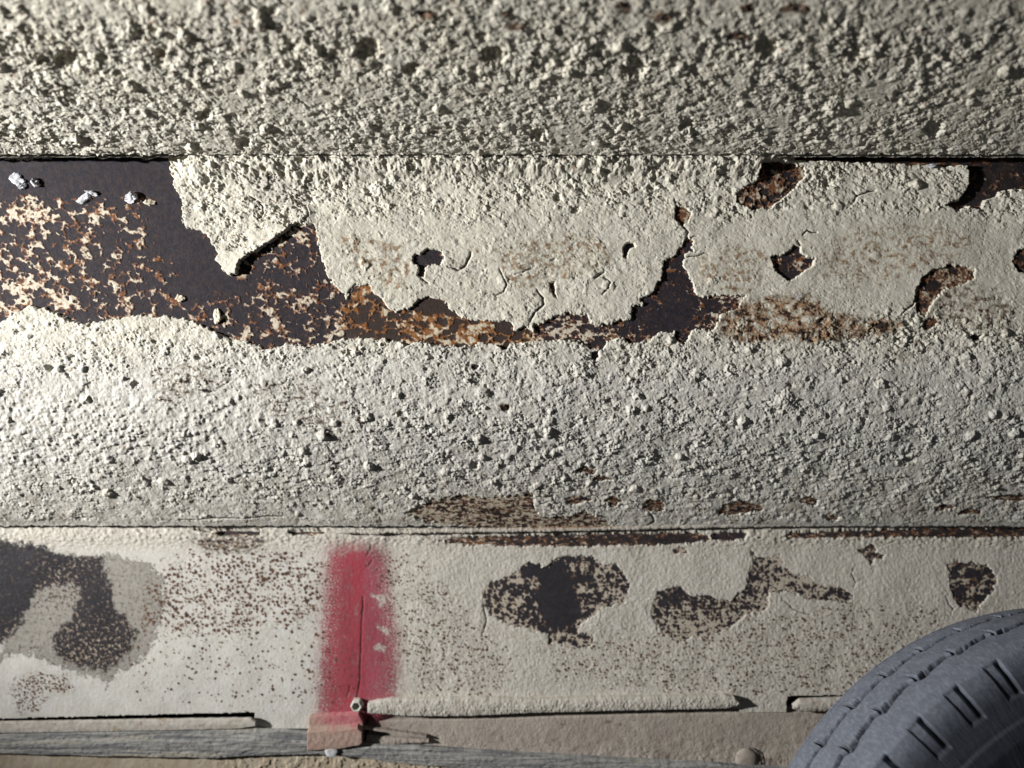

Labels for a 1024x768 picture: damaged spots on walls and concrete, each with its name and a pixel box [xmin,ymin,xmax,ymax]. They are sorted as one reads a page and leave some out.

peeling [947,157,1024,211]
peeling [0,156,346,350]
corrosion [338,236,536,347]
corrosion [499,235,609,287]
peeling [532,236,745,350]
corrosion [699,247,902,344]
corrosion [405,491,710,554]
peeling [0,540,168,690]
peeling [482,555,630,649]
peeling [651,551,854,642]
peeling [947,560,997,613]